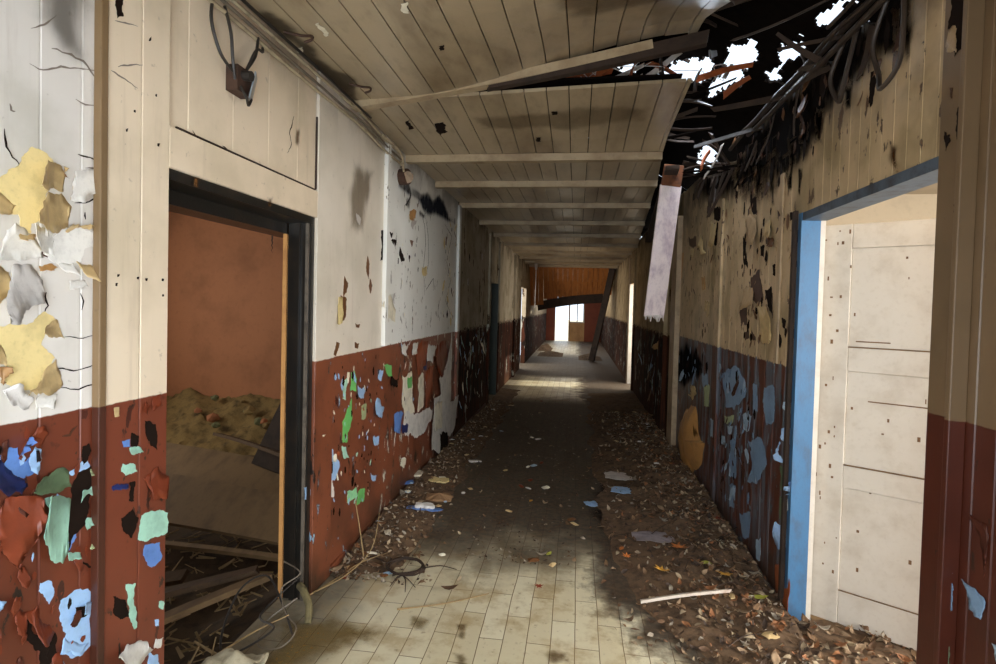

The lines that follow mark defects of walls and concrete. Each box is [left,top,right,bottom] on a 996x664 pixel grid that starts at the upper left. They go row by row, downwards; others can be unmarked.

crack [4,104,19,164]
crack [31,15,139,88]
spalling [681,73,828,348]
damp [700,0,911,202]
spalling [945,0,964,57]
peeling [0,426,95,664]
crack [58,365,92,390]
peeling [113,583,164,664]
peeling [112,394,169,567]
spalling [331,209,485,516]
peeling [702,364,791,561]
peeling [950,579,986,620]